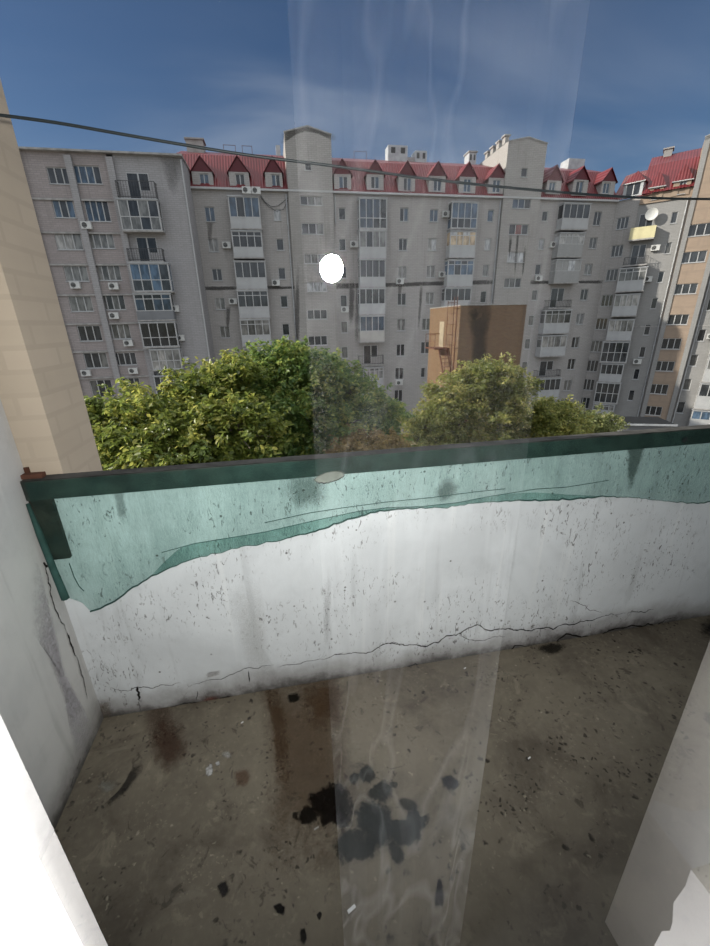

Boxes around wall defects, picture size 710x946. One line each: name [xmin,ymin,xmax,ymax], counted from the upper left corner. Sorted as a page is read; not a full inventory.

damp [471,310,487,361]
peeling [315,471,344,483]
damp [628,449,643,479]
crack [43,562,87,695]
crack [113,601,675,707]